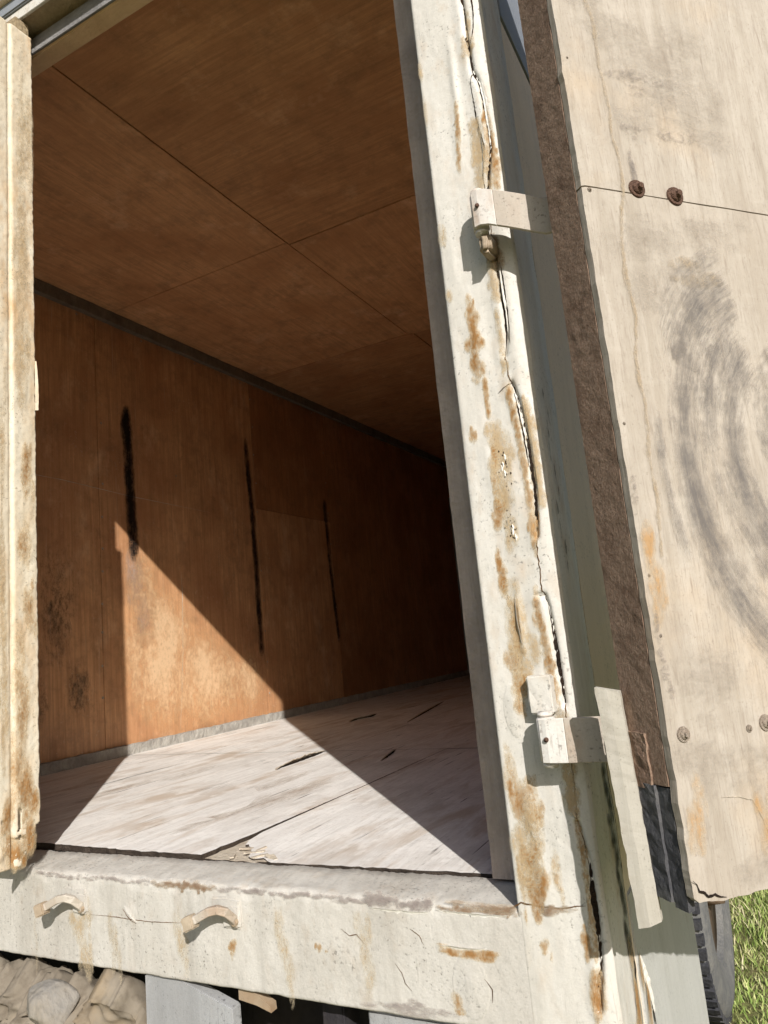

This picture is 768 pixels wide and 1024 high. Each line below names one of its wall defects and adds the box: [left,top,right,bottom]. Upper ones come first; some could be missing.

crack [460,0,492,189]
corrosion [18,530,30,558]
corrosion [21,444,31,496]
corrosion [465,235,547,551]
crack [490,225,567,718]
corrosion [0,542,39,870]
crack [275,751,324,770]
crack [407,701,444,722]
corrosion [448,757,564,923]
corrosion [495,550,564,718]
corrosion [562,763,606,1023]
crack [693,881,724,898]